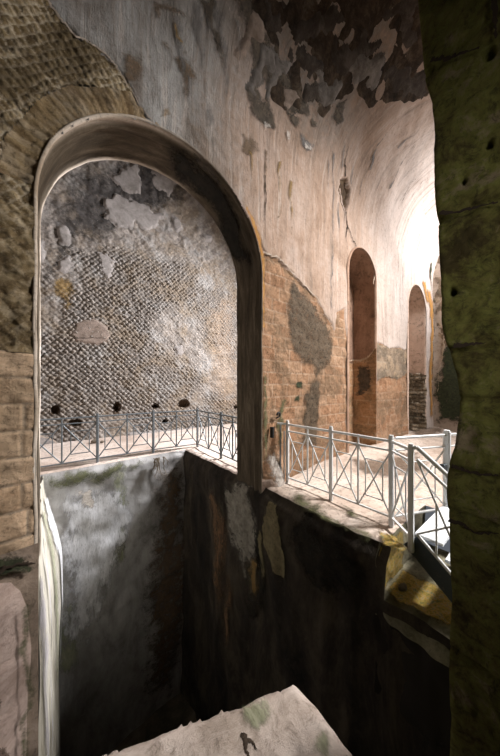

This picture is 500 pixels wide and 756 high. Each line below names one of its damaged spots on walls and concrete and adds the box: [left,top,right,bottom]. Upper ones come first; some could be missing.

peeling [233,0,429,129]
flaking render [0,0,146,555]
flaking render [258,242,427,483]
damp [40,471,131,756]
damp [143,468,185,694]